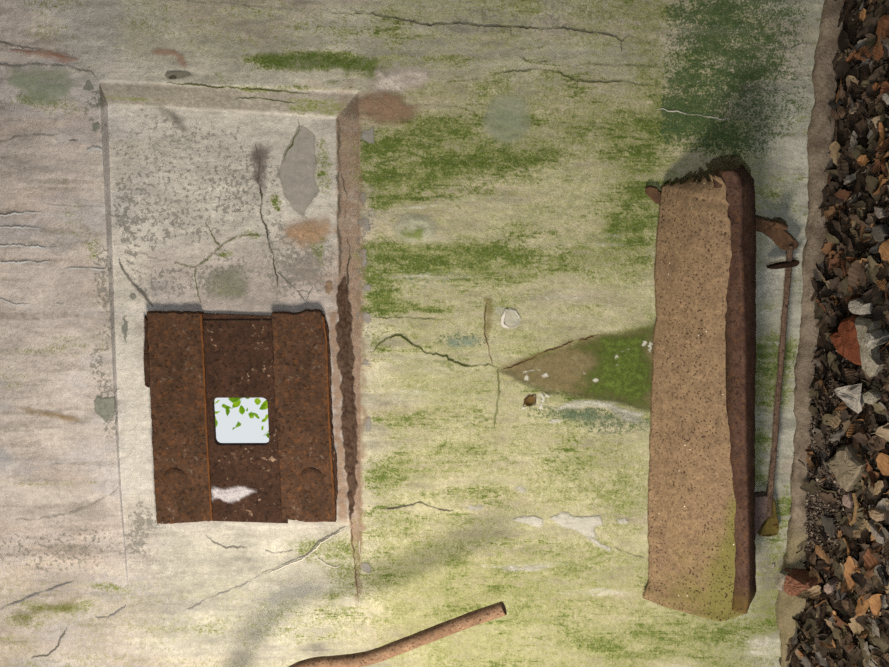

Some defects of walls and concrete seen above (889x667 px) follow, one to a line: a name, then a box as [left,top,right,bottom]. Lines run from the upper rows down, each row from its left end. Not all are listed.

crack [0,42,96,78]
crack [322,10,659,89]
crack [172,83,308,158]
crack [657,108,730,120]
spalling [280,126,319,216]
crack [143,145,313,303]
crack [119,259,154,307]
corrosion [286,173,364,522]
crack [369,304,605,429]
crack [2,581,74,609]
crack [188,526,360,610]
peeling [513,512,610,552]